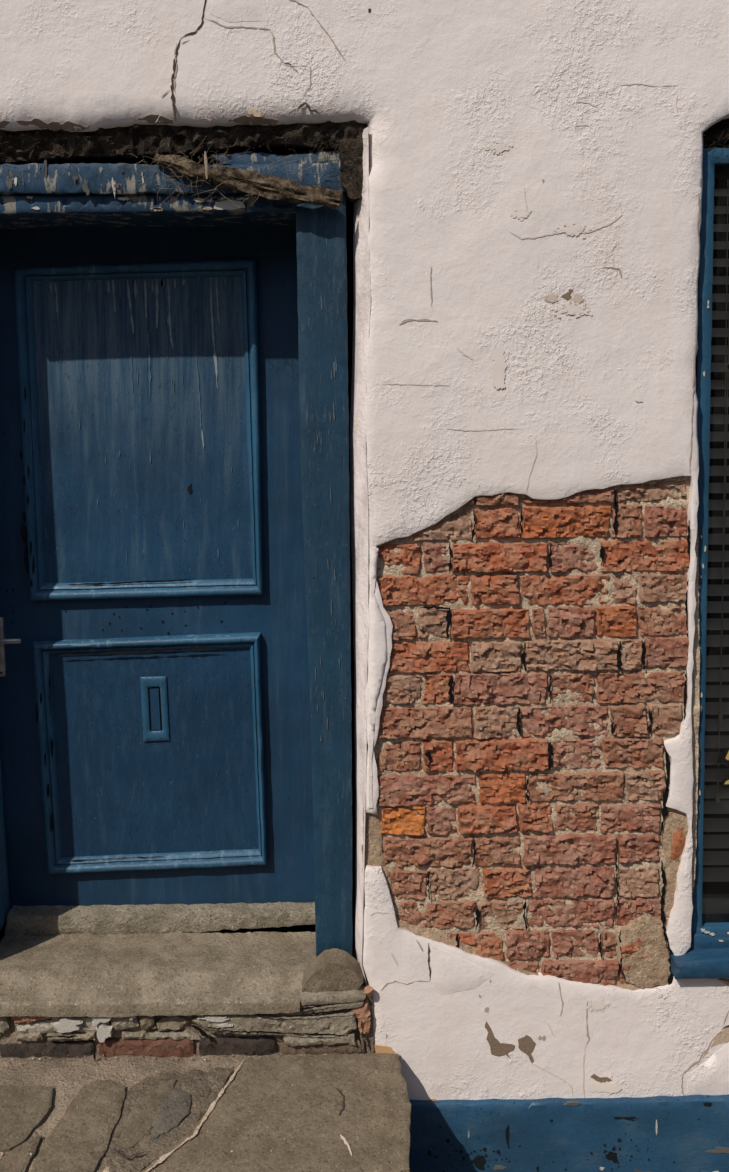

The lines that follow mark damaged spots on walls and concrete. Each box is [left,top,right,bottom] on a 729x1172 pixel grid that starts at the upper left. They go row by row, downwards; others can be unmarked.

crack [155,0,323,123]
crack [291,0,346,61]
spalling [0,109,369,210]
flaking render [361,476,706,991]
peeling [485,1021,536,1063]
crack [532,982,590,1098]
crack [681,1011,729,1096]
peeling [428,1125,521,1172]
peeling [587,1117,650,1172]